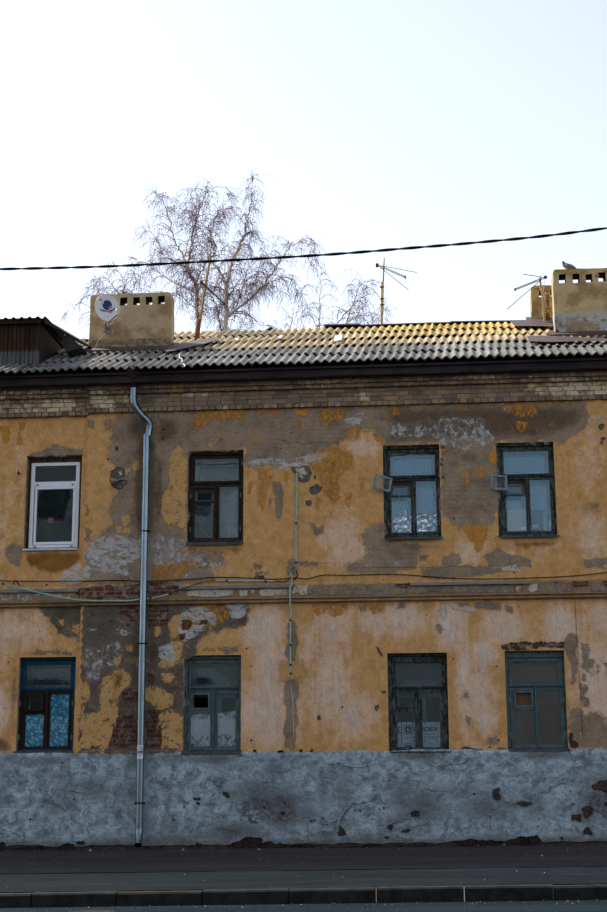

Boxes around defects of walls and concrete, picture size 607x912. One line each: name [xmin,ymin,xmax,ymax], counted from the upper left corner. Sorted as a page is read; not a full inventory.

flaking render [30,401,607,755]
spalling [571,780,607,836]